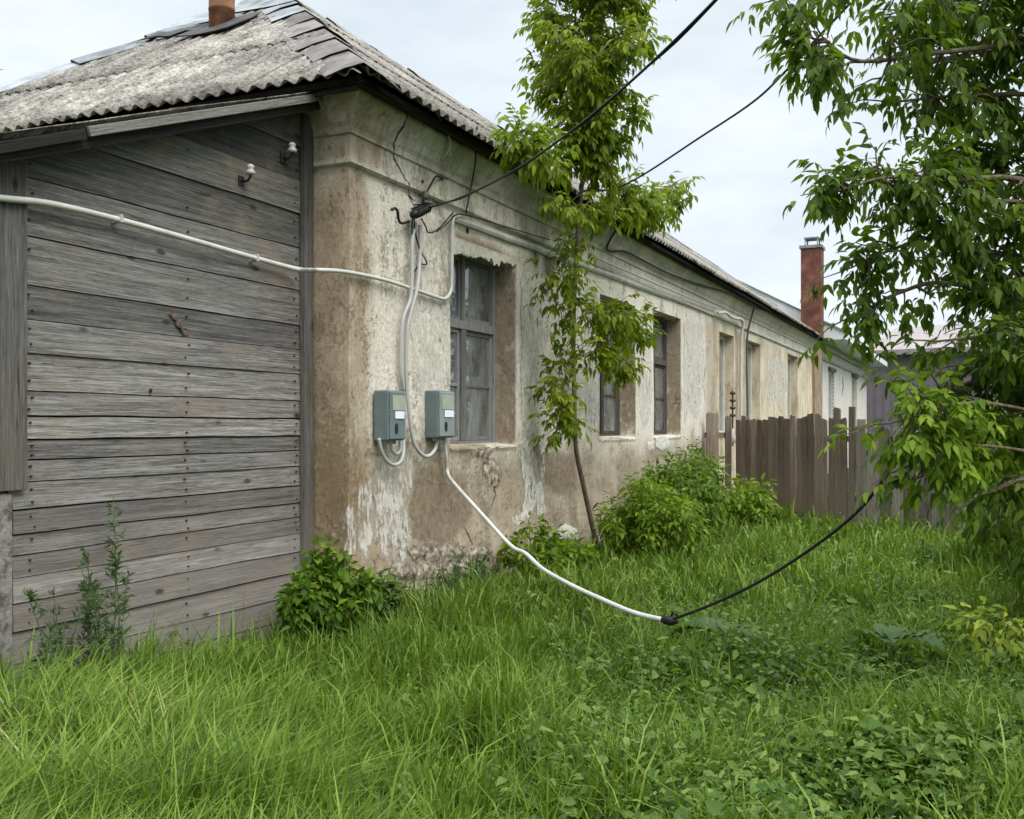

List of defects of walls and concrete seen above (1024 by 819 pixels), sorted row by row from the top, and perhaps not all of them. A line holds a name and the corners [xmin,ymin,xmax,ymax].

flaking render [471,448,502,489]
peeling [499,267,546,525]